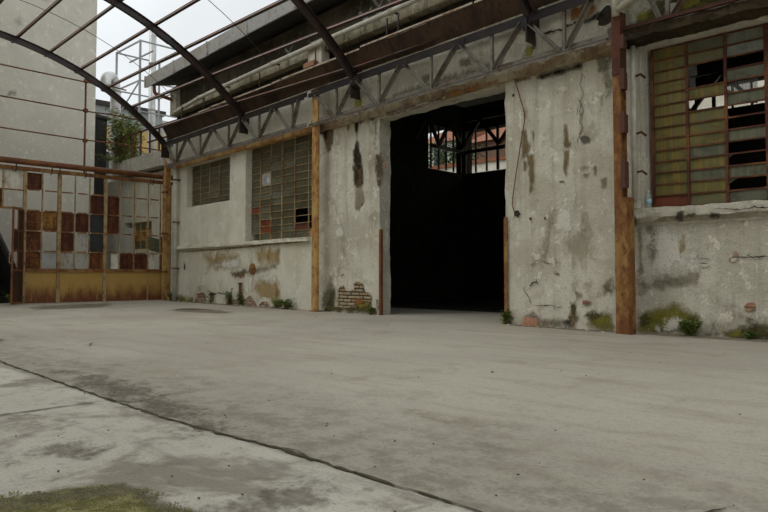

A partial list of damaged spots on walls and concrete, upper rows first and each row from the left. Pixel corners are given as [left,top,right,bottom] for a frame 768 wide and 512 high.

crack [575,68,586,152]
leakage [232,248,279,302]
flaking render [337,282,372,310]